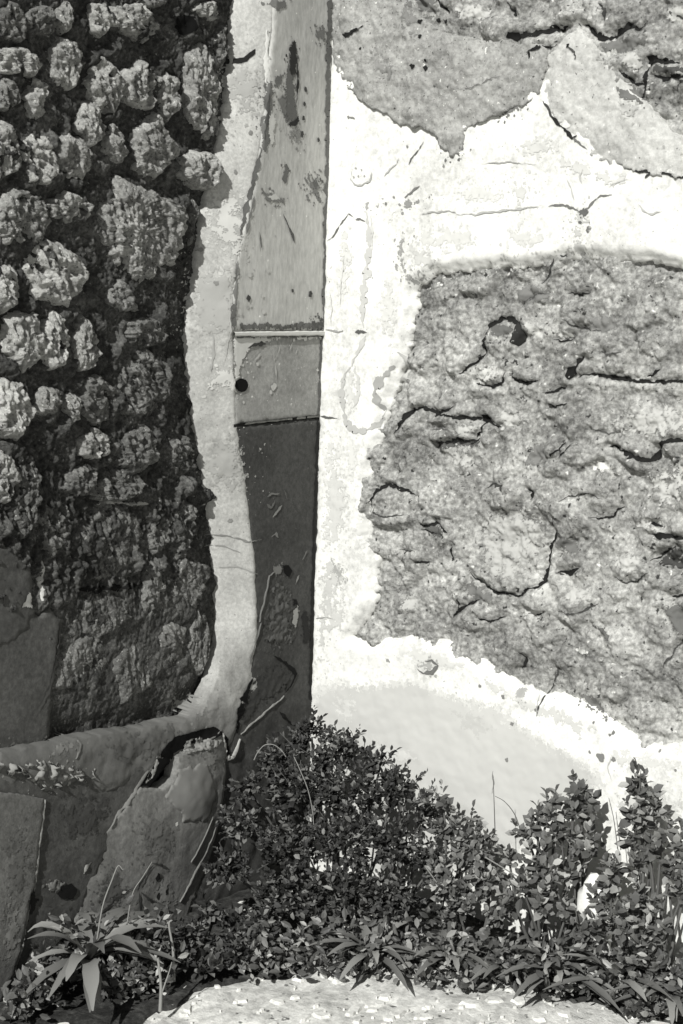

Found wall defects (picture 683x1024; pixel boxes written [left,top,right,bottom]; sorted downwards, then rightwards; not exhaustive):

flaking render [396,0,492,39]
spalling [249,30,307,152]
spalling [600,29,683,127]
crack [350,101,683,216]
spalling [491,274,574,347]
crack [459,258,683,408]
crack [393,405,501,447]
crack [595,429,683,462]
crack [370,483,624,623]
flaking render [452,488,582,607]
flaking render [613,460,683,582]
crack [616,522,683,584]